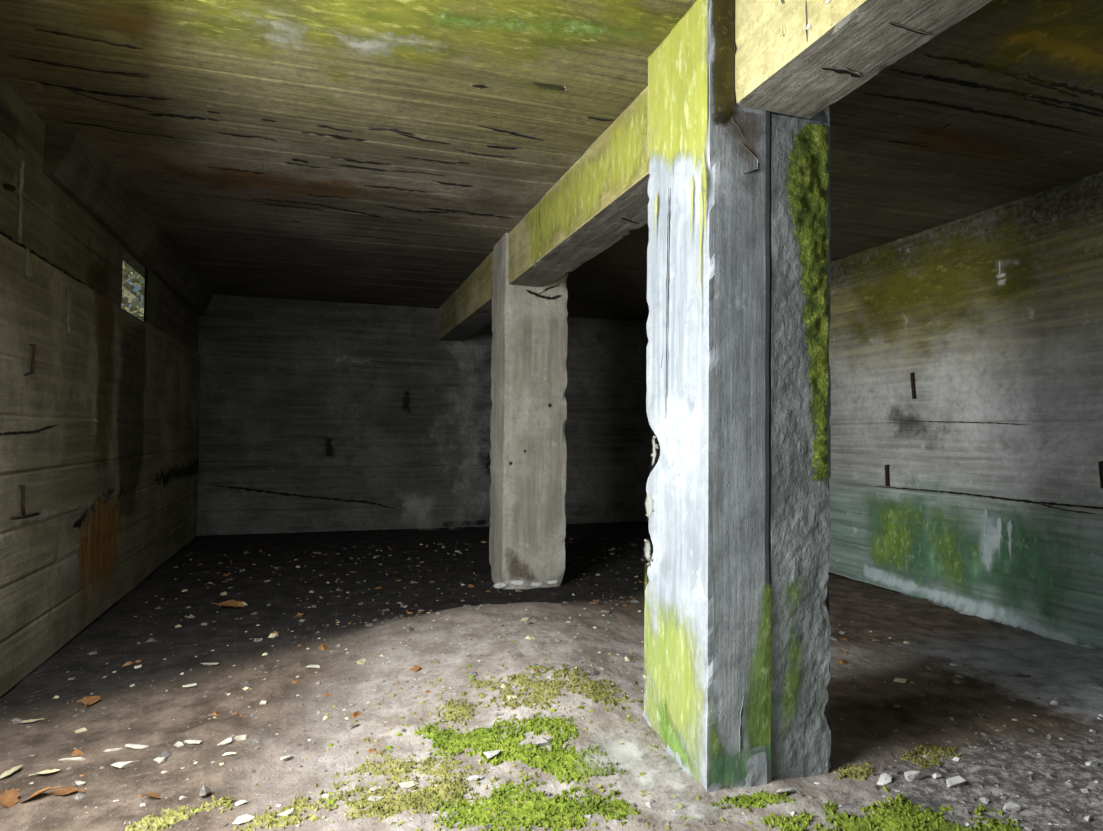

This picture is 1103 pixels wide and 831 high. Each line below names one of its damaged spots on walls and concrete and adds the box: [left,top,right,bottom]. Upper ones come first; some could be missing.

spalling [646,493,654,517]
water stain [981,510,1012,569]